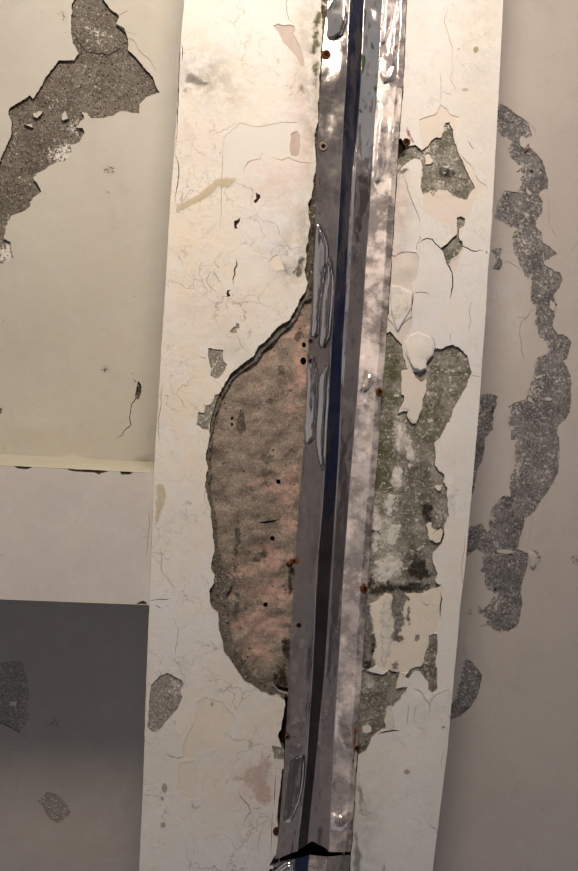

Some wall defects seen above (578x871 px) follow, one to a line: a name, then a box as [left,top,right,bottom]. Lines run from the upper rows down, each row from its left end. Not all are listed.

spalling [0,0,160,264]
crack [175,47,183,201]
spalling [314,0,328,159]
spalling [394,91,502,298]
crack [147,511,175,608]
spalling [196,171,316,700]
spalling [355,227,482,791]
spalling [466,102,572,634]
spalling [0,661,29,733]
spalling [147,673,183,732]
spalling [38,792,70,823]
crack [240,779,276,851]